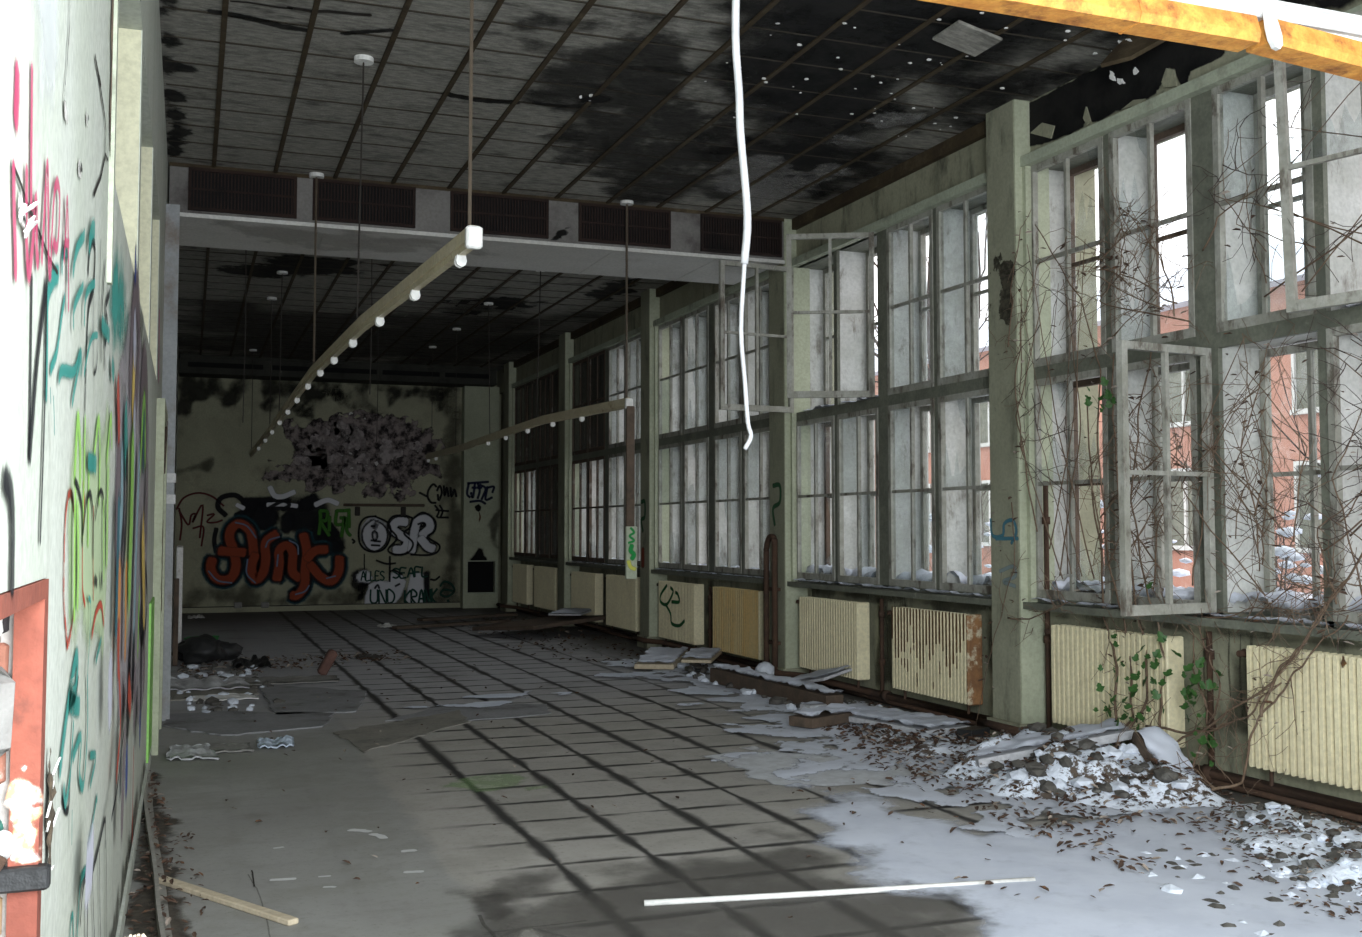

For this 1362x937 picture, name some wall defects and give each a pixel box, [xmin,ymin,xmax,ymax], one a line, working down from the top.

leakage [443,92,584,108]
leakage [867,113,923,128]
peeling [1029,39,1224,146]
leakage [715,155,851,207]
peeling [250,409,445,502]
leakage [465,849,961,937]